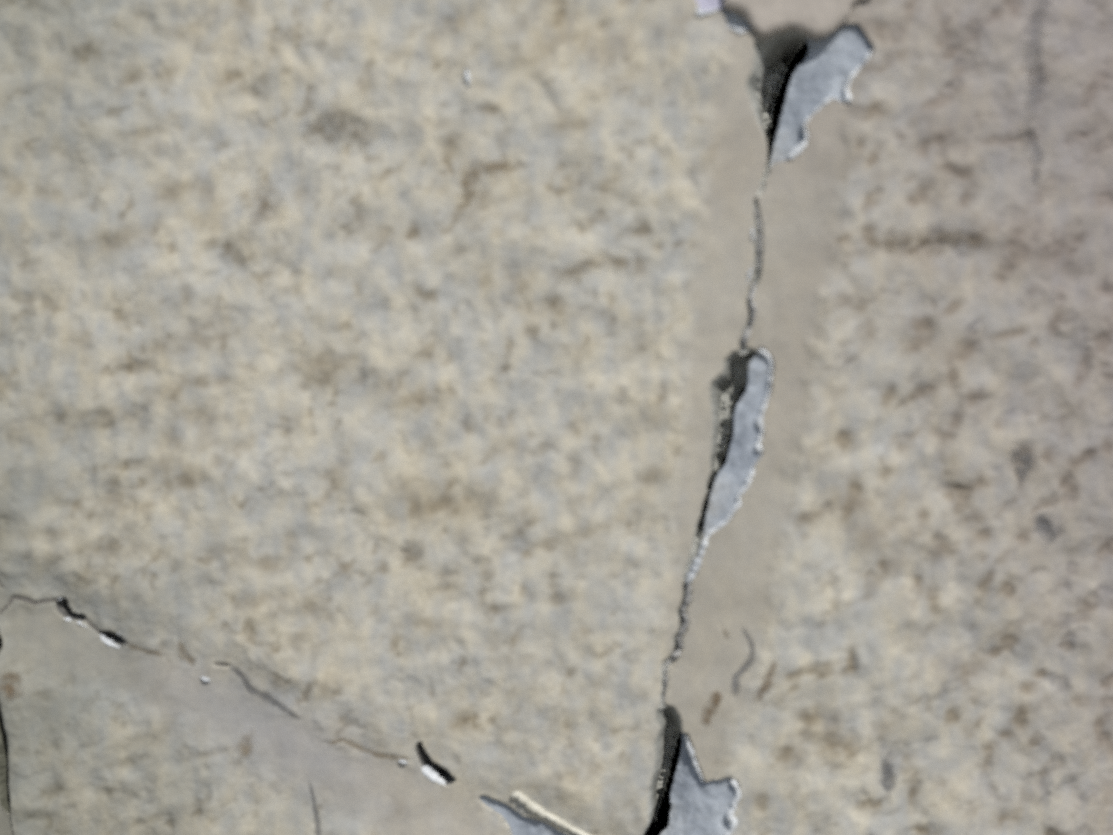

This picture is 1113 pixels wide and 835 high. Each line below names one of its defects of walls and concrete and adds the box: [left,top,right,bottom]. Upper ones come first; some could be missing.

spalling [696,0,873,199]
crack [739,198,763,355]
spalling [682,346,774,585]
crack [0,583,58,650]
crack [215,663,295,716]
crack [658,579,692,709]
crack [733,631,754,689]
crack [0,708,10,813]
crack [310,785,319,835]
spalling [399,741,456,785]
spalling [479,791,589,835]
spalling [642,699,741,835]